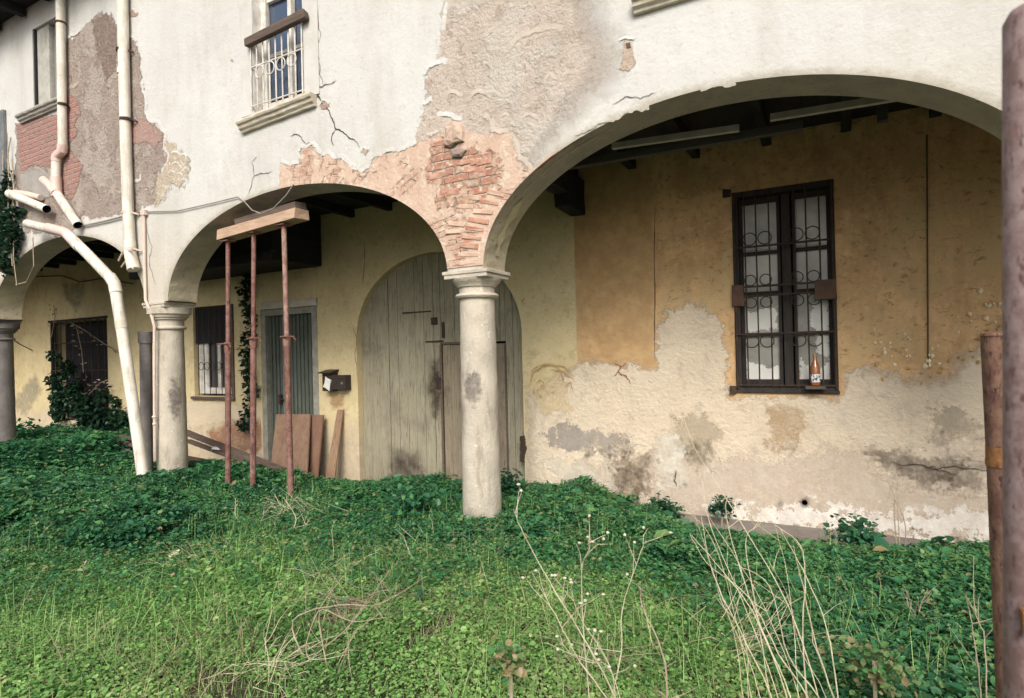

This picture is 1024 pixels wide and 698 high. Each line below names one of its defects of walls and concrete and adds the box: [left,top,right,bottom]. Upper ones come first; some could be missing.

flaking render [14,11,191,238]
crack [292,8,360,147]
flaking render [279,0,649,269]
spalling [700,80,736,92]
damp [429,364,441,417]
damp [465,373,481,400]
peeling [519,288,1002,542]
damp [534,382,989,543]
crack [891,461,986,475]